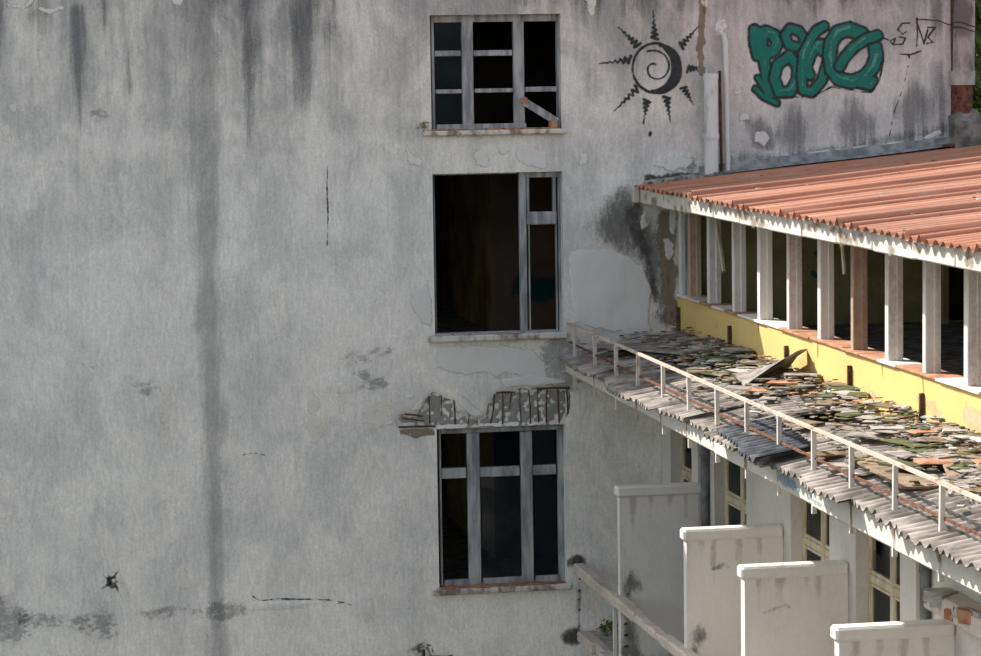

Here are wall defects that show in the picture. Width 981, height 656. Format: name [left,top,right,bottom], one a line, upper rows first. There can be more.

corrosion [696,0,706,76]
crack [323,167,331,245]
leakage [645,155,699,180]
leakage [600,192,679,325]
peeling [396,345,570,429]